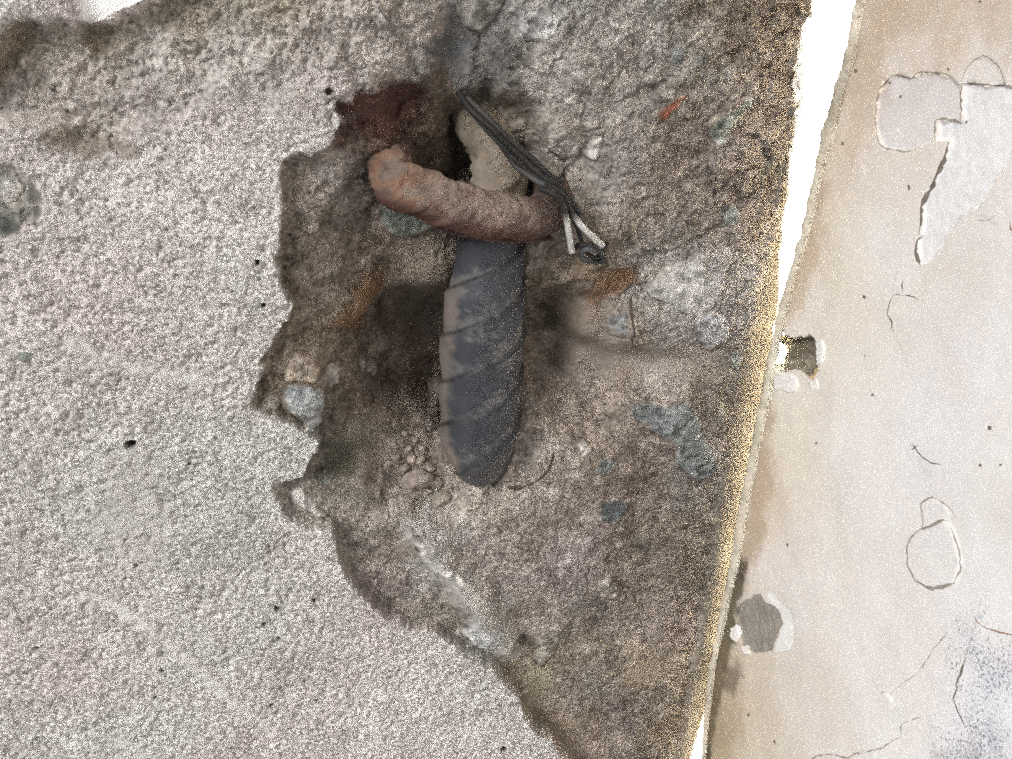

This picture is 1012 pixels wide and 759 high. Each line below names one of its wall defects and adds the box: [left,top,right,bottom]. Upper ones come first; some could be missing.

spalling [0,0,381,154]
corrosion [334,83,424,143]
peeling [874,55,1012,266]
spalling [249,0,817,759]
spalling [701,0,865,759]
crack [812,718,921,759]
crack [889,631,948,696]
crack [952,649,968,728]
leakage [927,595,1012,759]
crack [974,617,1012,635]